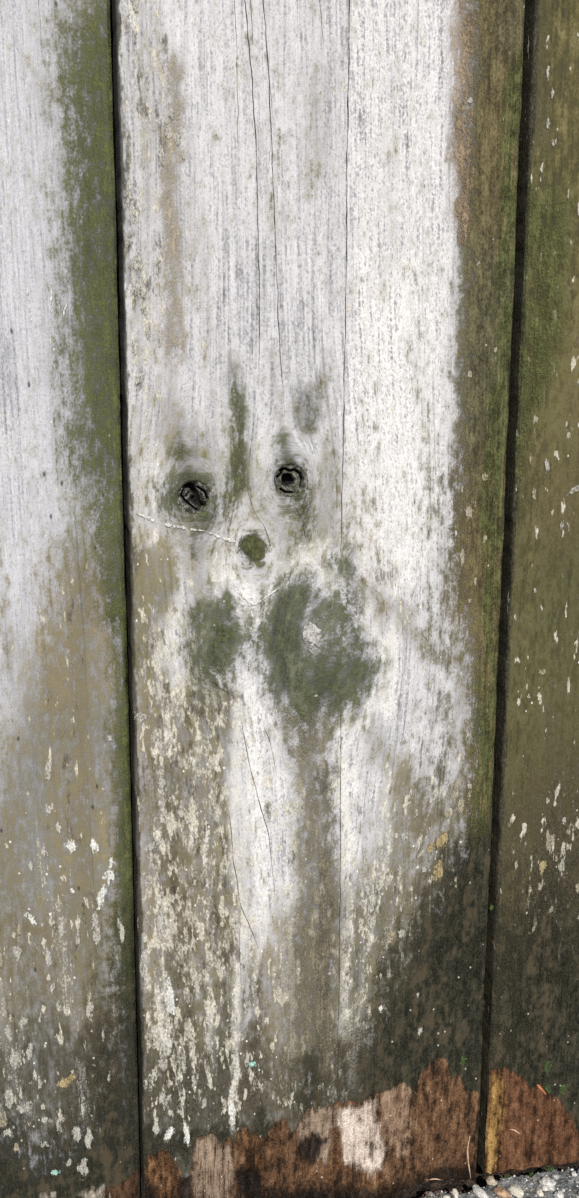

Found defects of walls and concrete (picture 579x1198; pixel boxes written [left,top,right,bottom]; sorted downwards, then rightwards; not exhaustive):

leakage [0,0,273,1198]
leakage [186,0,579,1134]